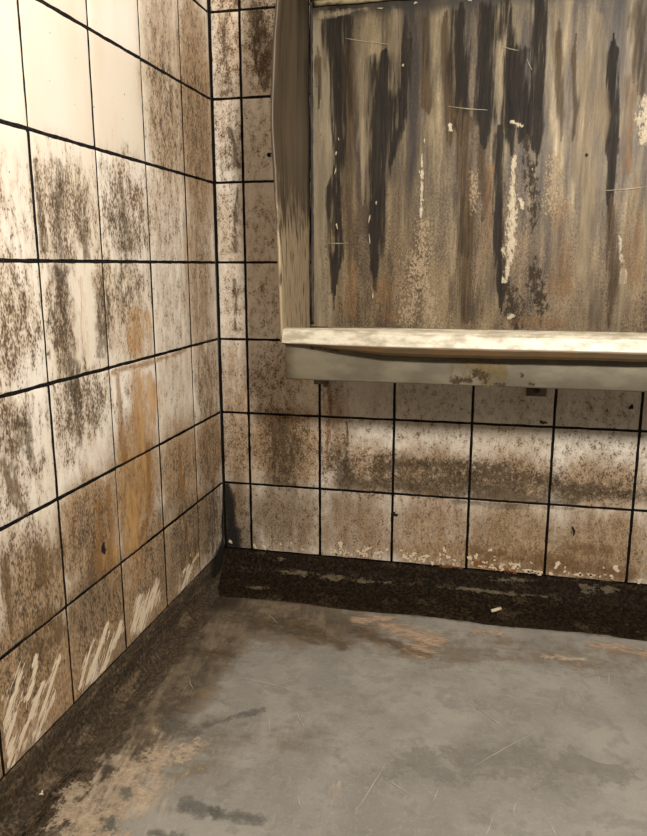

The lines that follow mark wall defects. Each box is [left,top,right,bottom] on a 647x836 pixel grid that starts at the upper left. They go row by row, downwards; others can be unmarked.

damp [221,18,231,95]
damp [249,2,272,92]
damp [628,2,647,146]
damp [314,4,413,310]
damp [399,0,625,330]
damp [0,456,28,523]
corrosion [96,376,156,569]
damp [329,450,647,507]
damp [0,554,13,637]
spalling [330,541,388,559]
spalling [400,546,458,566]
peeling [437,548,620,598]